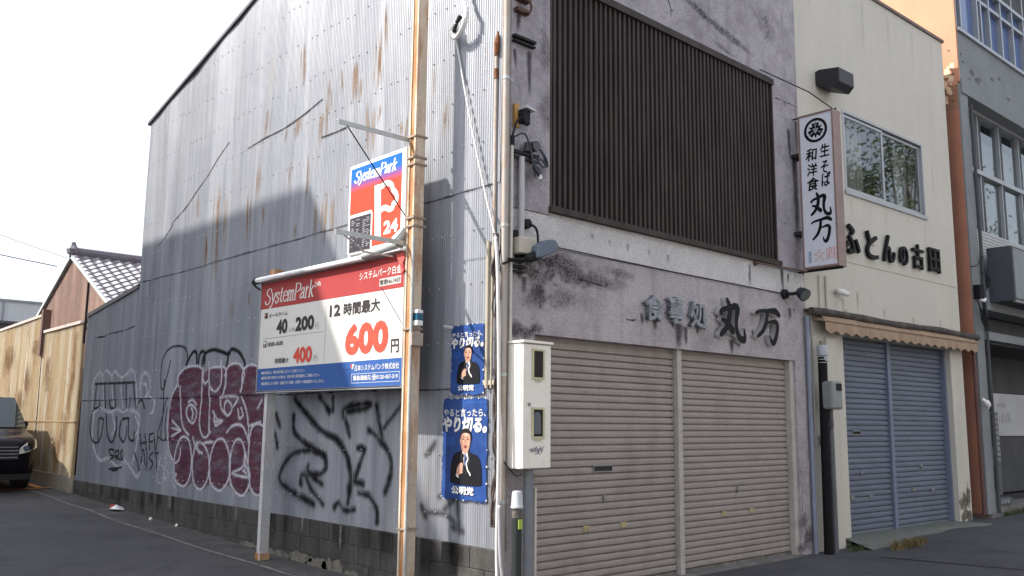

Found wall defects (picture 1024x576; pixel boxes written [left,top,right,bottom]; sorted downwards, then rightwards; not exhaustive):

damp [518,254,622,300]
mould [512,322,540,338]
damp [671,323,705,342]